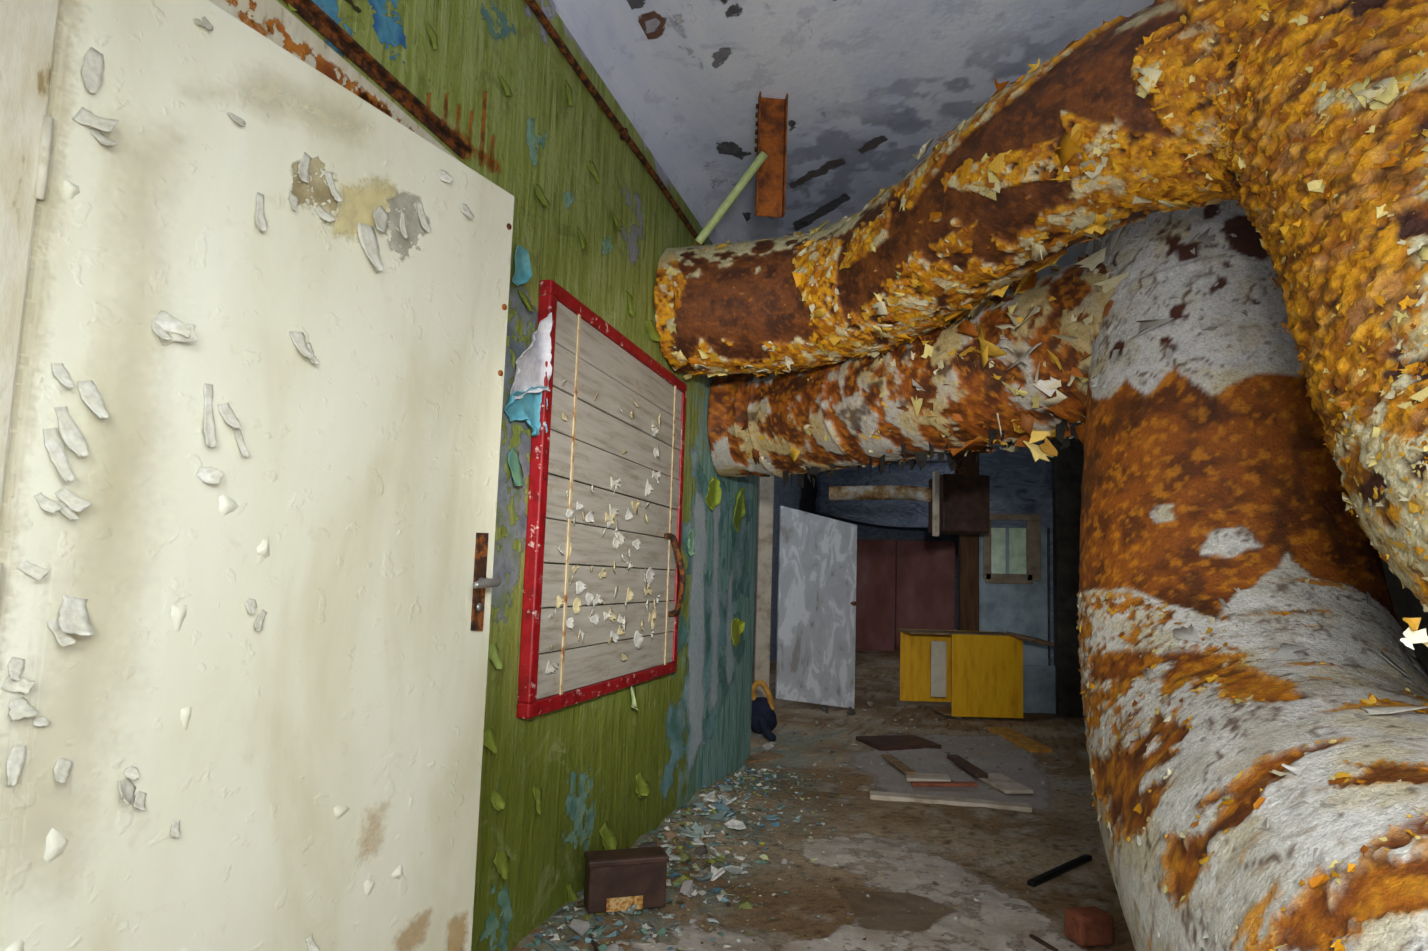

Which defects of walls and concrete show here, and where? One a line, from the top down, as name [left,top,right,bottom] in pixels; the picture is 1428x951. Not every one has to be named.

peeling [312,0,354,36]
peeling [73,47,119,146]
corrosion [226,0,414,132]
peeling [526,117,547,166]
peeling [255,192,268,231]
peeling [289,152,343,222]
peeling [357,192,431,271]
peeling [152,310,198,345]
peeling [625,0,1428,612]
peeling [33,363,109,521]
peeling [203,383,250,457]
peeling [245,598,268,631]